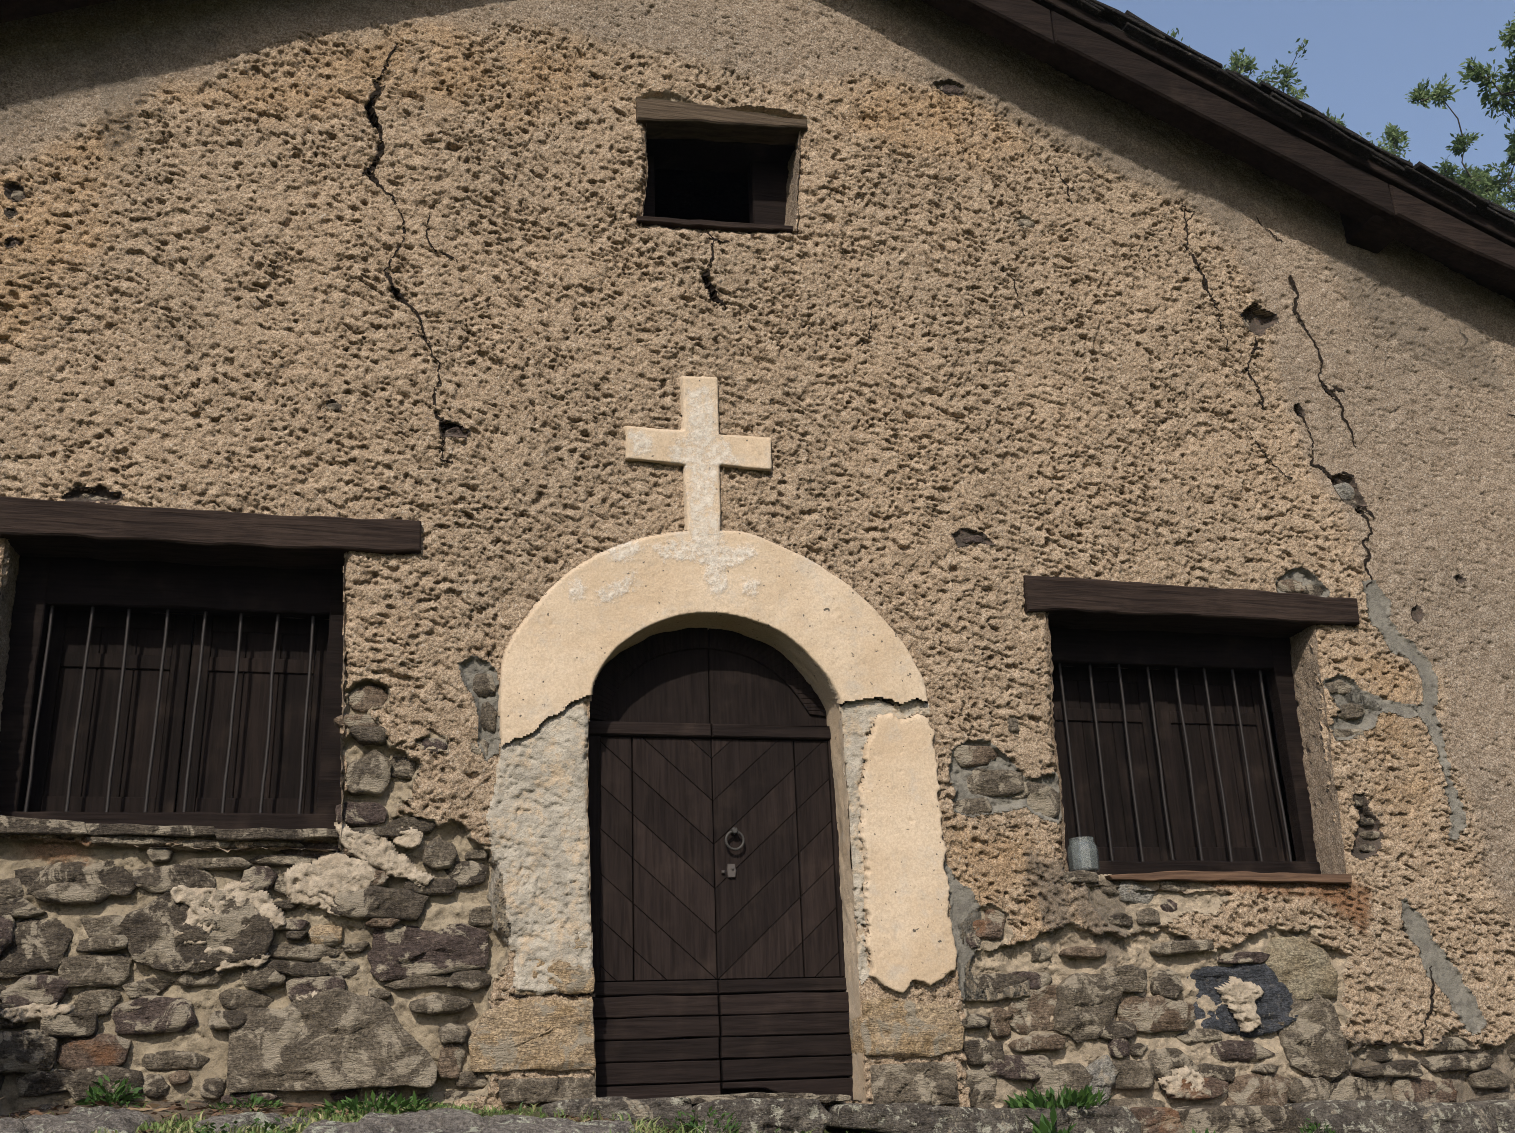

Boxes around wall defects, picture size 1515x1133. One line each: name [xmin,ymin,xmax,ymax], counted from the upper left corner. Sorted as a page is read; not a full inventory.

crack [362,43,468,464]
crack [703,231,733,309]
flaking render [1241,301,1279,336]
crack [1178,199,1375,587]
flaking render [1411,605,1425,623]
flaking render [1007,716,1020,736]
flaking render [1323,674,1384,741]
flaking render [949,739,1062,823]
flaking render [1351,792,1384,860]
flaking render [0,654,593,1115]
flaking render [959,874,1515,1110]